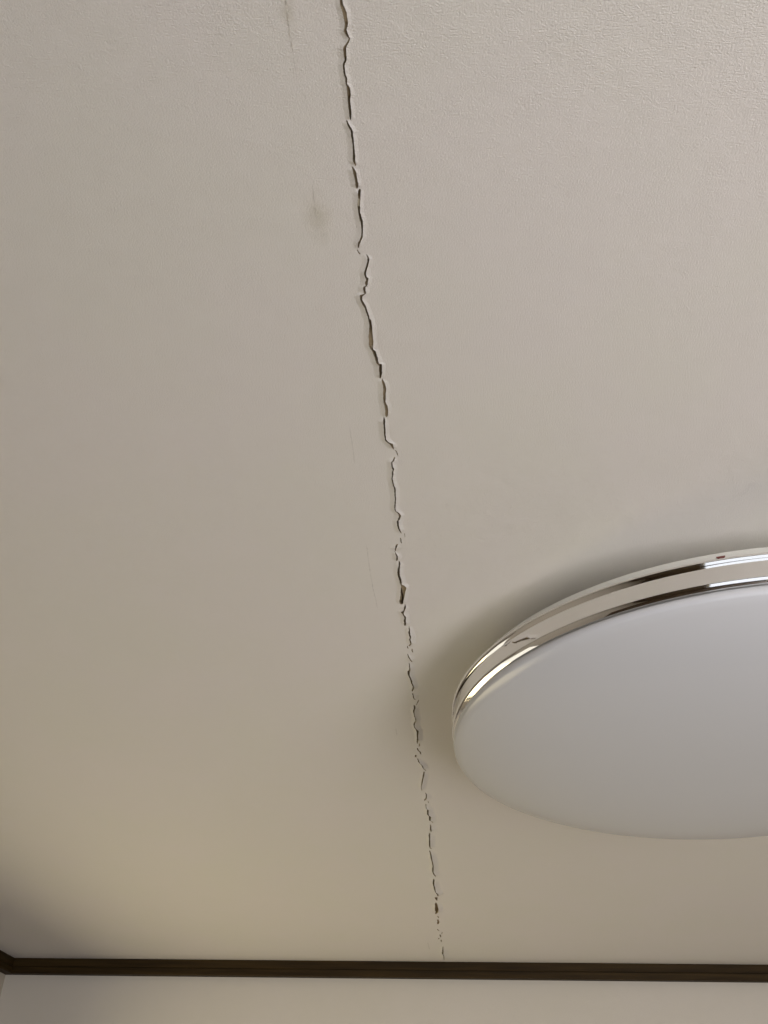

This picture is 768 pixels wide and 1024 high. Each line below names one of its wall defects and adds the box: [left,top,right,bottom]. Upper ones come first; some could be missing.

crack [334,0,450,960]